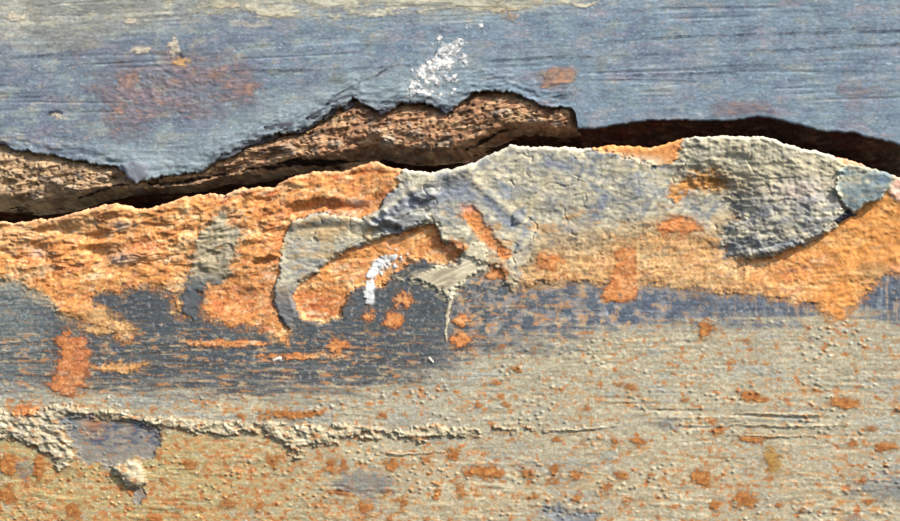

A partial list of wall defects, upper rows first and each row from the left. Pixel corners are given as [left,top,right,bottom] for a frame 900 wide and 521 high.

crack [0,117,900,224]
rust [592,138,683,170]
rust [667,167,729,202]
rust [833,155,865,167]
peeling [0,91,740,341]
rust [0,161,414,398]
rust [292,224,468,324]
rust [461,190,900,324]
rust [449,313,472,348]
spalling [59,413,164,470]
spalling [127,486,146,506]
rust [447,446,505,498]